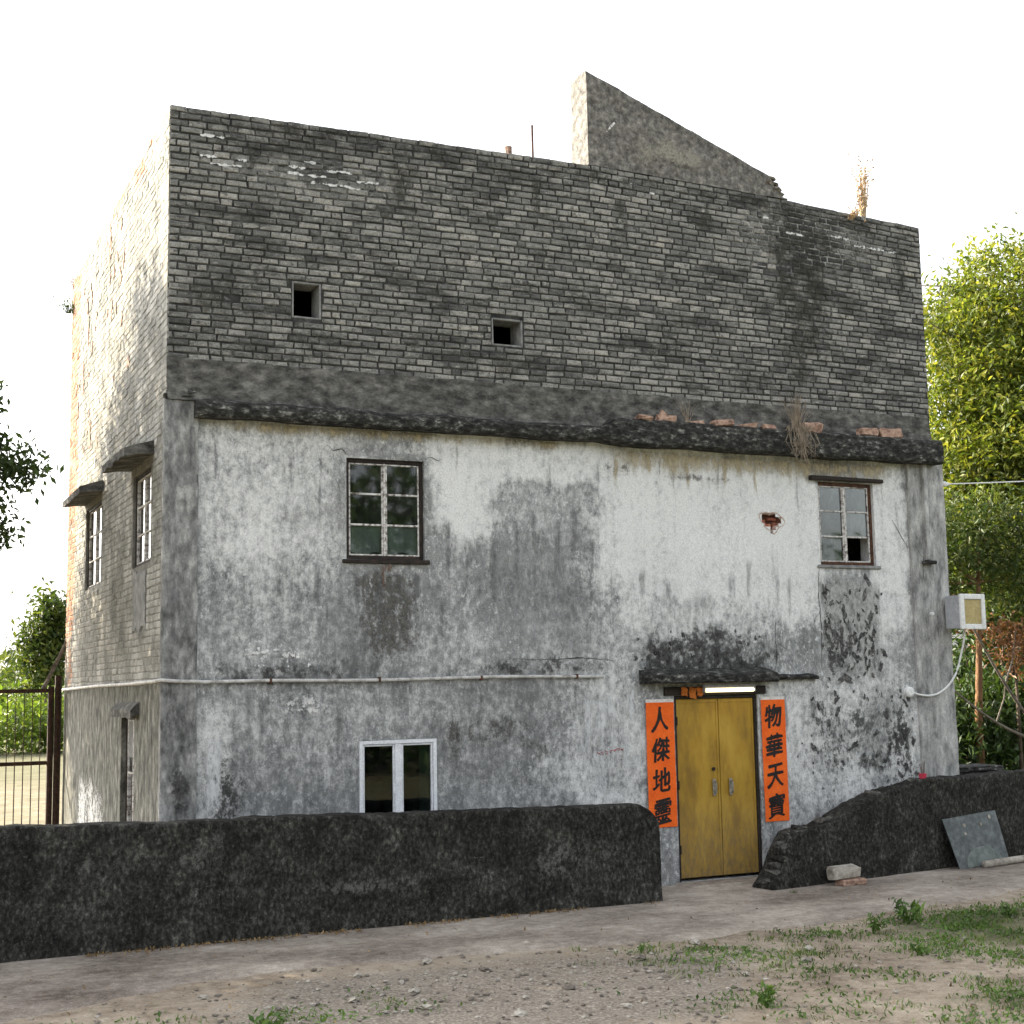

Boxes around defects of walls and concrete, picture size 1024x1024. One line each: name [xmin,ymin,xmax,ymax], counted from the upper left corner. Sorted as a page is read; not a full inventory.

damp [607,452,881,485]
spalling [758,512,785,534]
damp [356,572,418,658]
damp [481,657,584,675]
damp [634,626,778,670]
peeling [811,574,919,787]